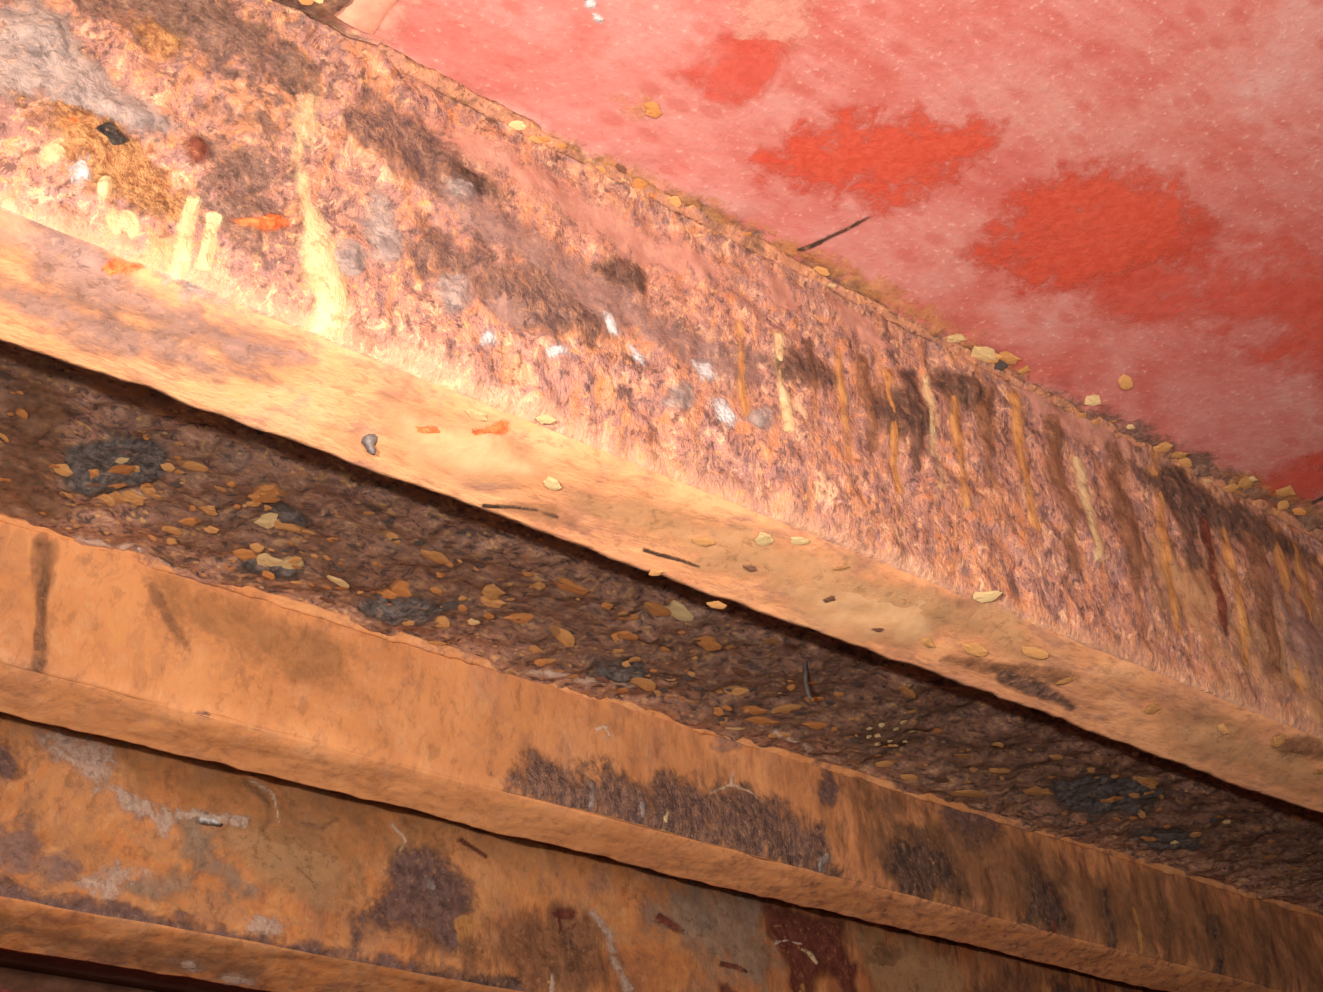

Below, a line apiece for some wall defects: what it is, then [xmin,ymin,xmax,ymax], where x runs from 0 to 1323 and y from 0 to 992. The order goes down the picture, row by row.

corrosion [268,0,353,19]
corrosion [0,217,308,380]
corrosion [393,409,562,490]
corrosion [774,331,795,431]
corrosion [835,348,970,509]
corrosion [930,333,1040,532]
corrosion [31,544,49,673]
corrosion [39,431,1076,902]
corrosion [1044,392,1323,721]
corrosion [1022,749,1278,860]
corrosion [0,826,634,992]
corrosion [647,877,857,992]